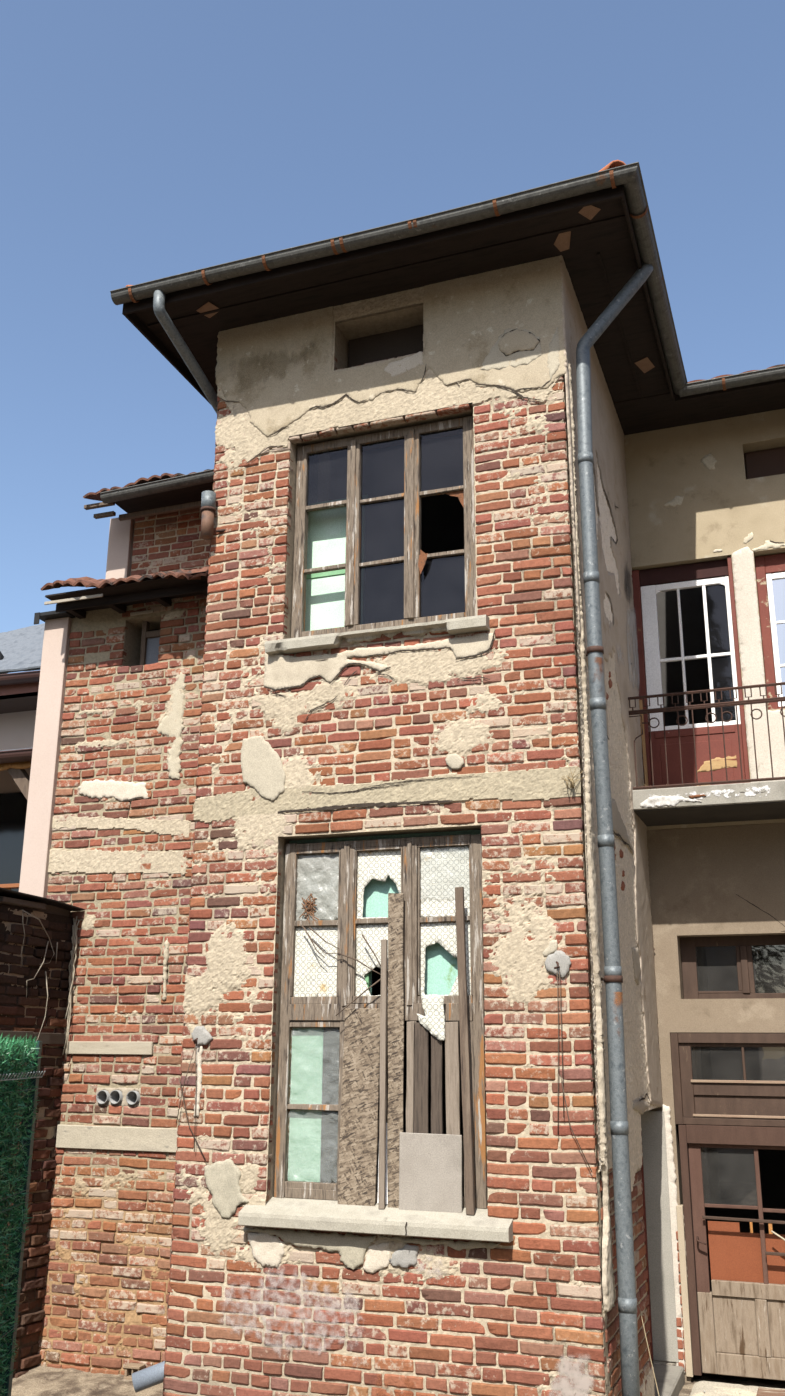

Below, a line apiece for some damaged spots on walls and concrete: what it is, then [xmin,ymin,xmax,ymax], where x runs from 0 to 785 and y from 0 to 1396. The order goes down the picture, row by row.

crack [247,366,550,463]
flaking render [592,450,619,624]
flaking render [264,633,494,690]
spalling [640,794,706,807]
flaking render [243,1227,501,1270]